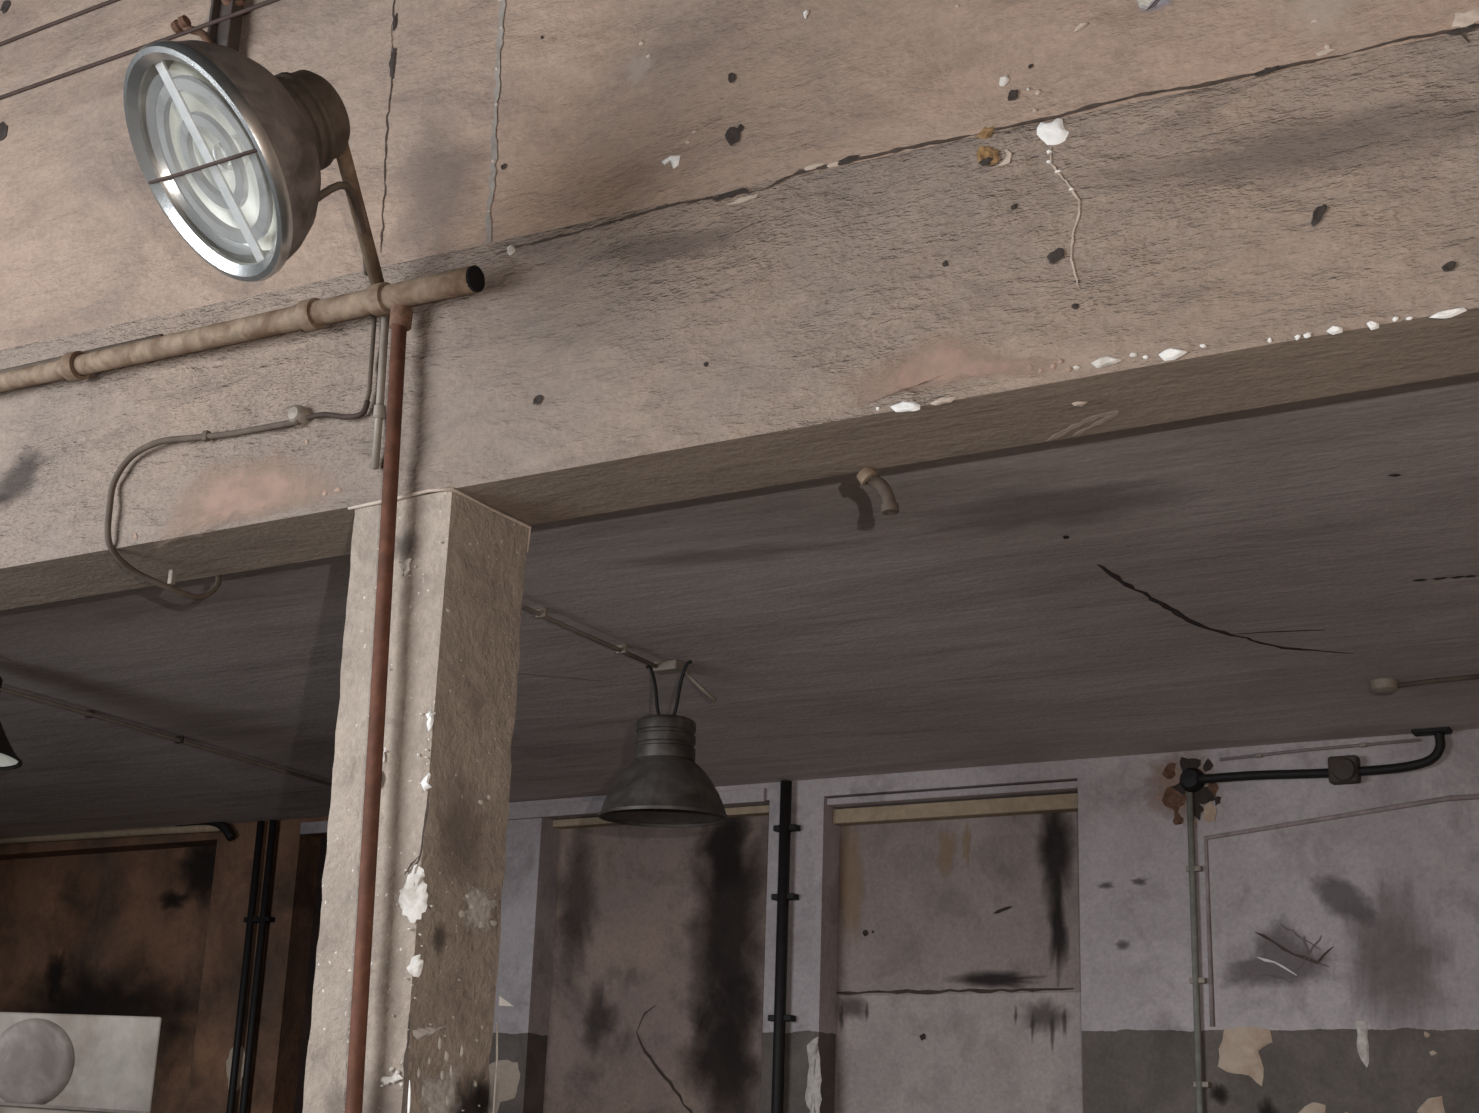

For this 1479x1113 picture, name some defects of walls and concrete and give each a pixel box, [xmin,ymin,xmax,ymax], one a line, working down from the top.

crack [496,6,1479,255]
crack [1097,564,1353,654]
water stain [705,821,741,878]
peeling [396,864,433,980]
peeling [458,887,498,931]
water stain [1051,898,1066,965]
water stain [693,1006,752,1109]
peeling [1218,1026,1272,1086]
peeling [1356,1021,1369,1067]
peeling [1299,1102,1326,1113]
peeling [1417,1096,1445,1113]